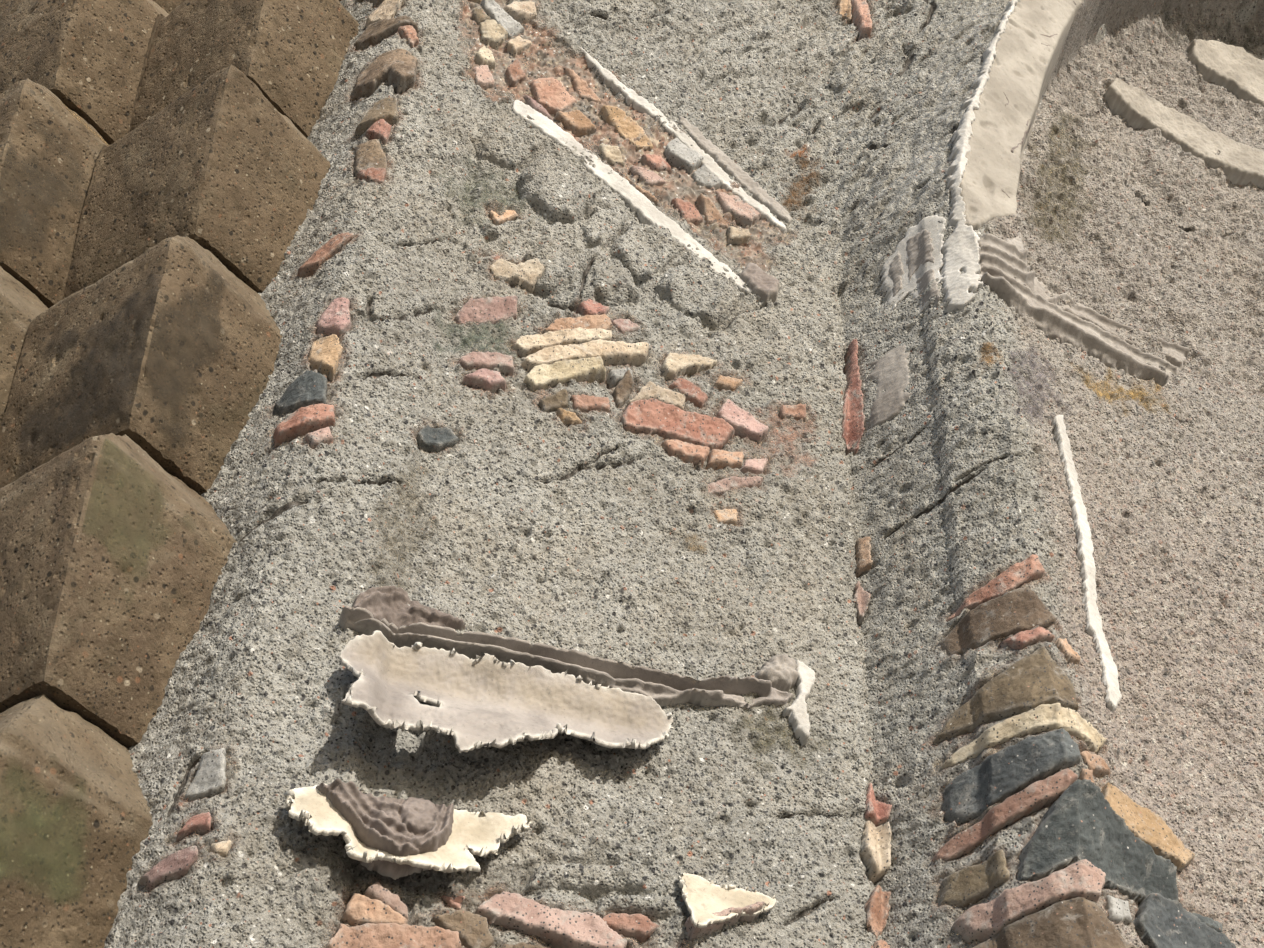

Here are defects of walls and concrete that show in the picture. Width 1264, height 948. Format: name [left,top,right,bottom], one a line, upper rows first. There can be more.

crack [546,446,636,484]
crack [873,432,921,468]
crack [239,478,401,542]
crack [884,457,1007,539]
crack [769,812,858,820]
spalling [327,882,659,948]
peeling [677,871,776,942]